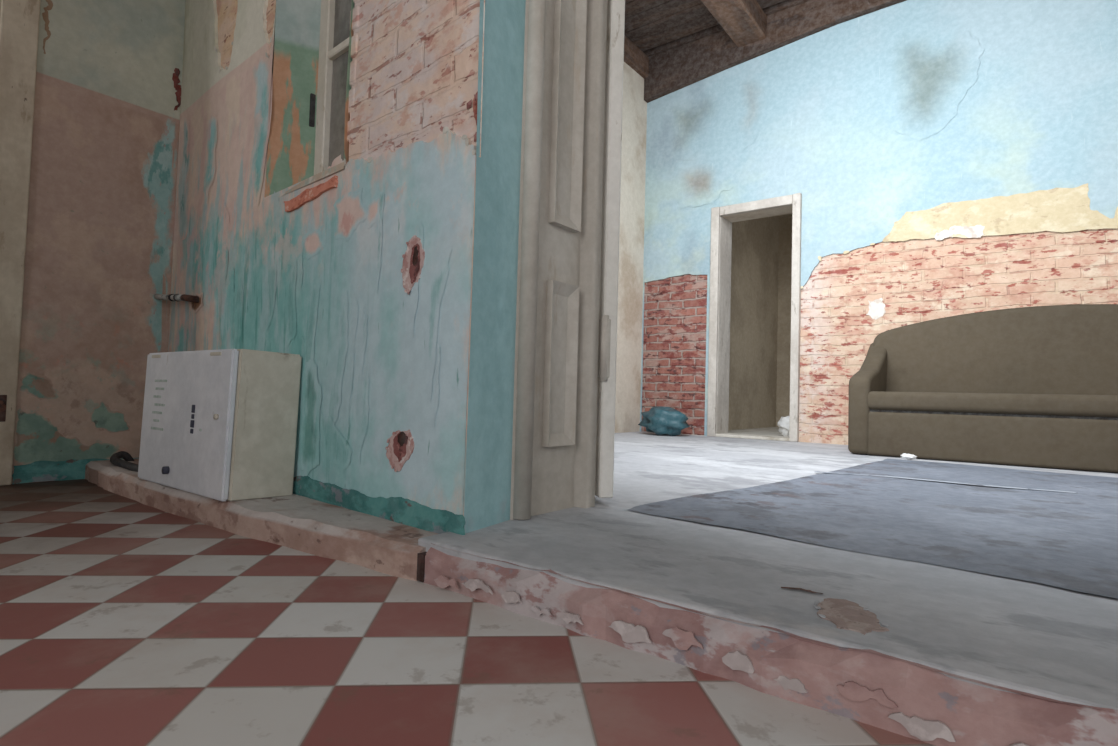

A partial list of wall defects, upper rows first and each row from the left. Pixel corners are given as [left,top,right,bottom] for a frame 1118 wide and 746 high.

leakage [879,23,985,141]
peeling [139,0,485,515]
spalling [641,274,707,435]
spalling [799,183,1118,445]
peeling [13,355,145,467]
peeling [434,575,584,625]
peeling [608,620,704,650]
peeling [722,650,755,674]
peeling [837,681,956,742]